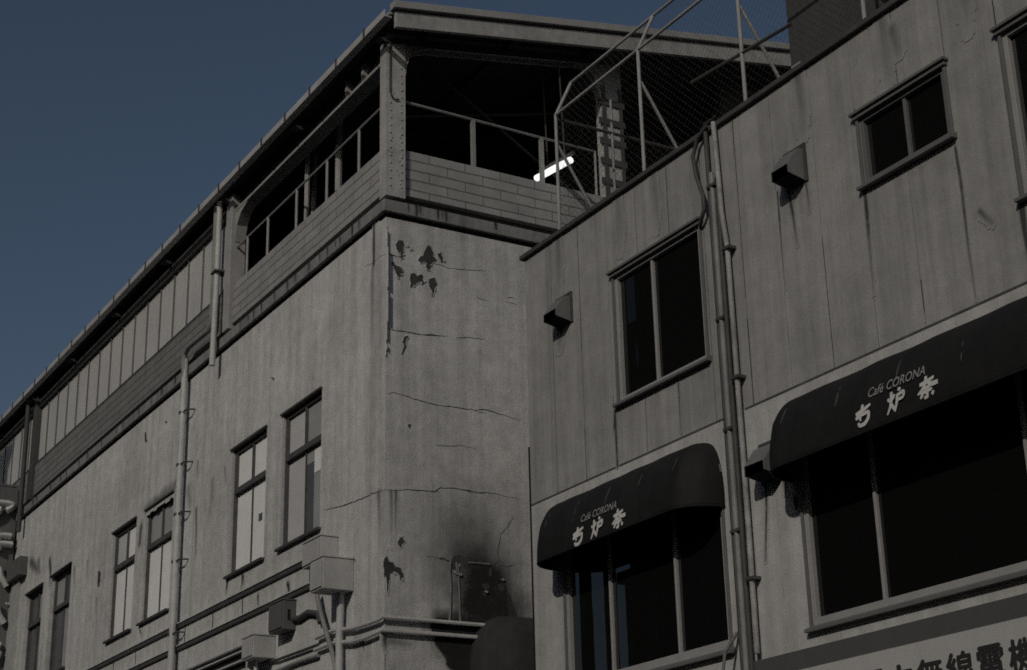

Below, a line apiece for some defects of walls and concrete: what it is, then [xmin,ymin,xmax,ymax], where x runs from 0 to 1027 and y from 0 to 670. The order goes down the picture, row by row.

spalling [391,239,445,297]
crack [387,328,485,340]
crack [389,392,518,420]
crack [327,487,518,570]
spalling [383,556,404,595]